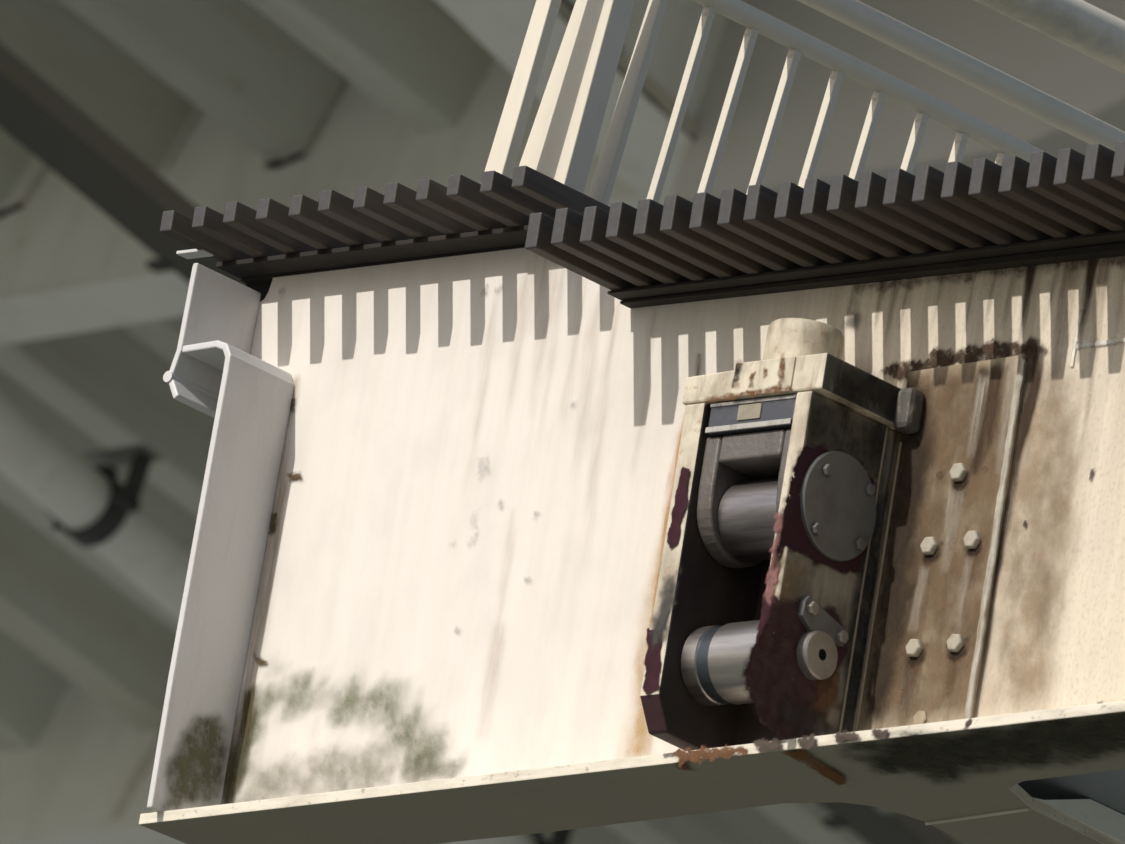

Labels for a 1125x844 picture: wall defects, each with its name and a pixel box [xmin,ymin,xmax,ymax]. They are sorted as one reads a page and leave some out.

rust [707,356,791,402]
rust [653,429,682,611]
rust [866,337,1046,718]
water stain [223,686,255,804]
rust [634,672,645,752]
rust [783,751,846,785]